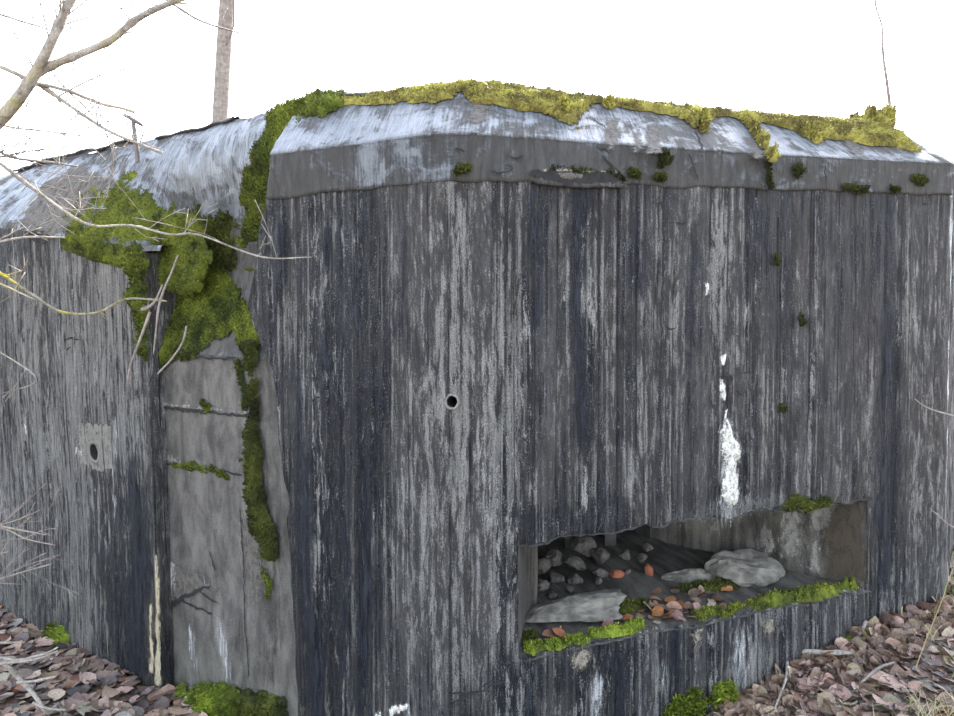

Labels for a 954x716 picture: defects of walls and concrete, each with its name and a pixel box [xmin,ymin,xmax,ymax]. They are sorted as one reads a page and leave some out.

water stain [709,381,742,535]
water stain [758,503,834,573]